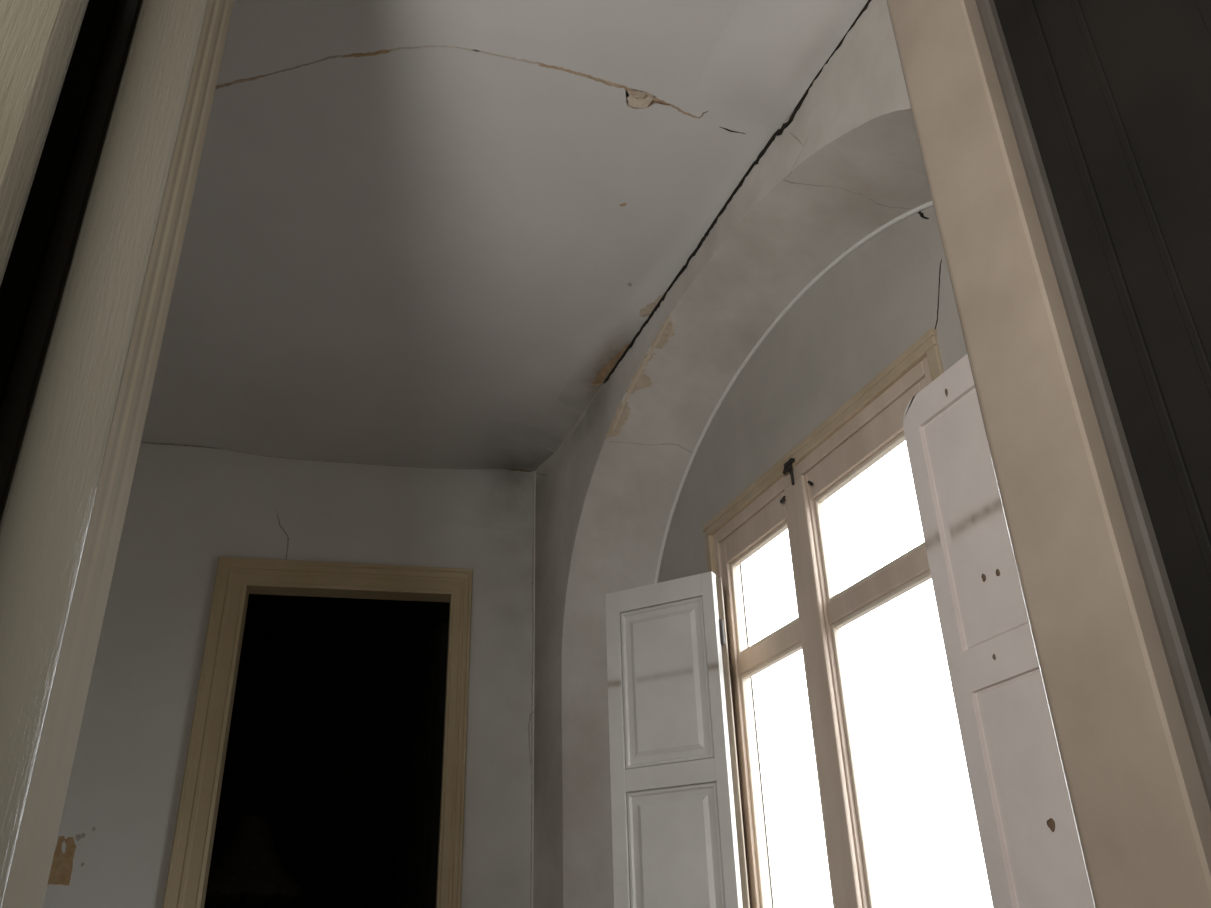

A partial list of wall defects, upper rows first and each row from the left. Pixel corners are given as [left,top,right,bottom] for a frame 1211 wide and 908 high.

flaking render [625,89,657,109]
crack [215,0,929,408]
flaking render [605,315,675,439]
peeling [47,827,96,885]